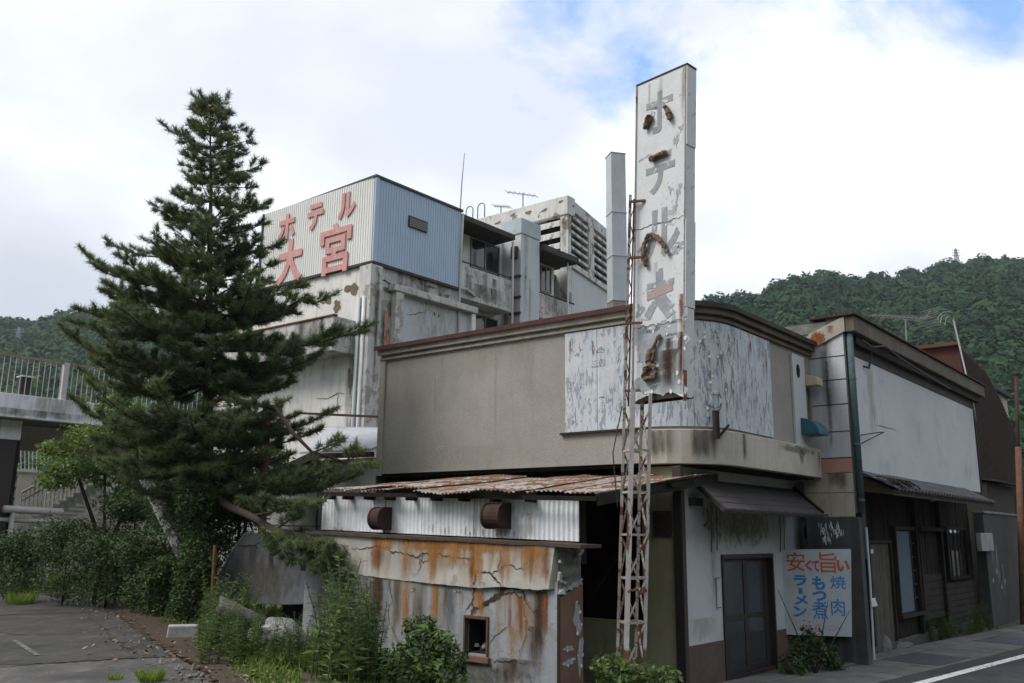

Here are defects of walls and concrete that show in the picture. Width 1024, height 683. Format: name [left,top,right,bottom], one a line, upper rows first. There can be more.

spalling [318,282,359,313]
peeling [699,328,768,425]
rust [374,577,383,617]
crack [420,587,541,668]
rust [503,589,547,679]
peeling [562,601,584,678]